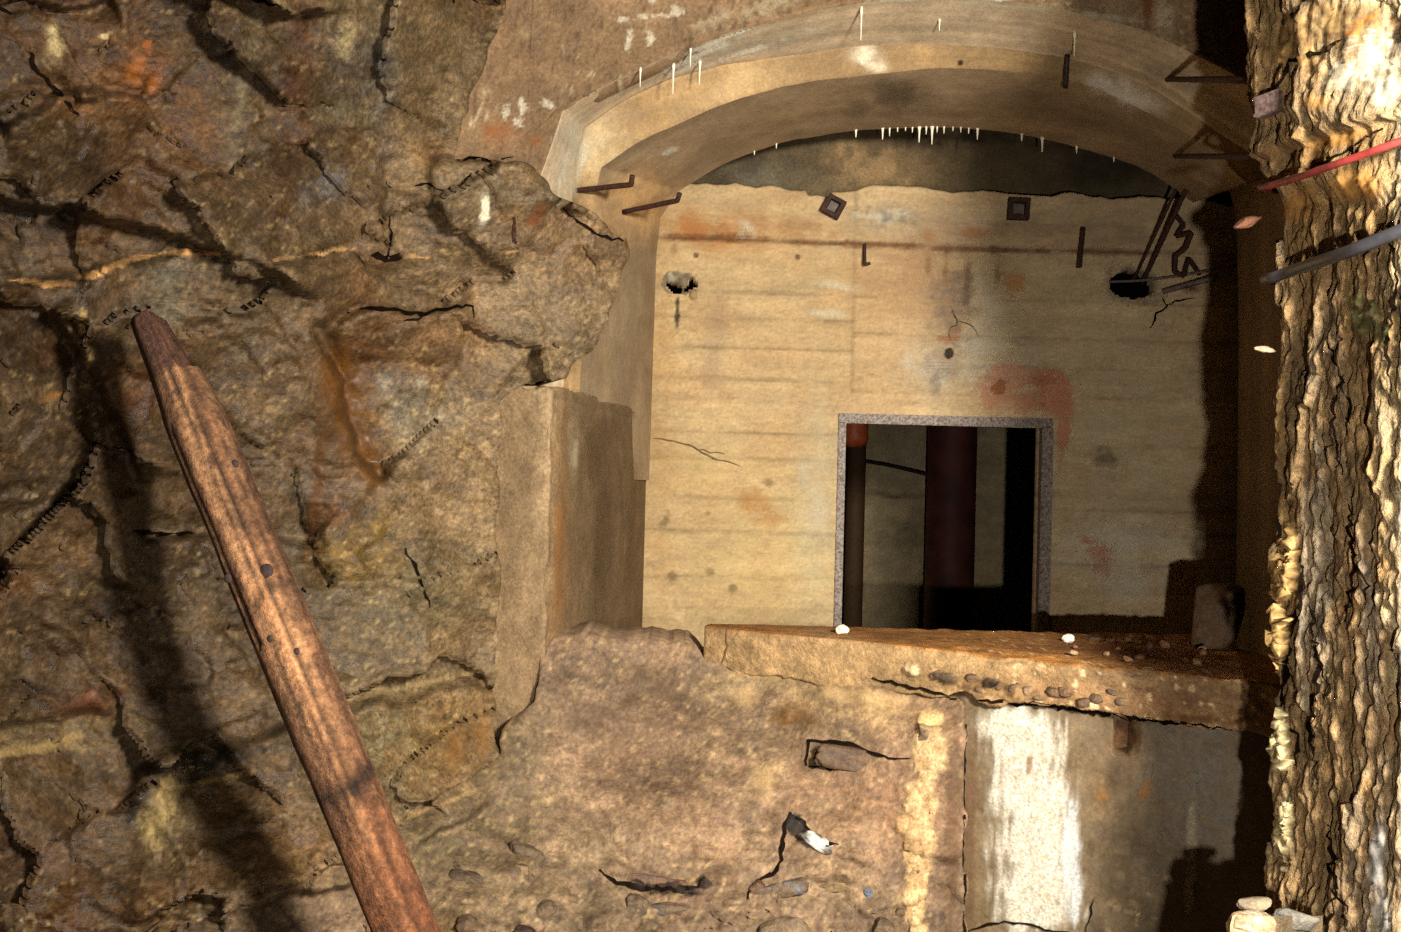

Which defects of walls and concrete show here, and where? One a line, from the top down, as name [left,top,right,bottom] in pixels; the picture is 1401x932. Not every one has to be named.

crack [872,677,1232,932]
crack [599,869,705,893]
crack [747,812,837,899]